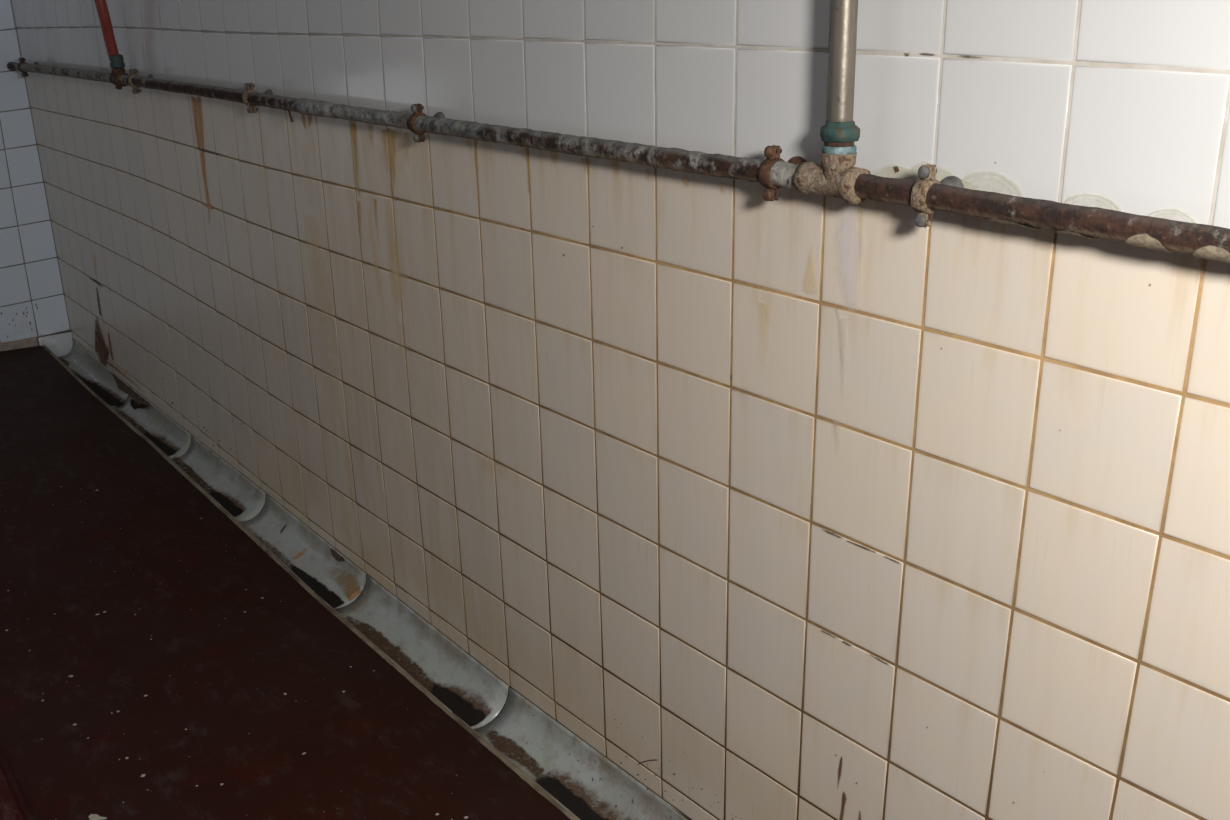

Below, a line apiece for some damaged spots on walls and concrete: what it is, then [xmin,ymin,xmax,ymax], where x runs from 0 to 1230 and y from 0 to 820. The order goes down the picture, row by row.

rust [191,96,219,210]
rust [89,262,127,378]
rust [838,757,846,820]